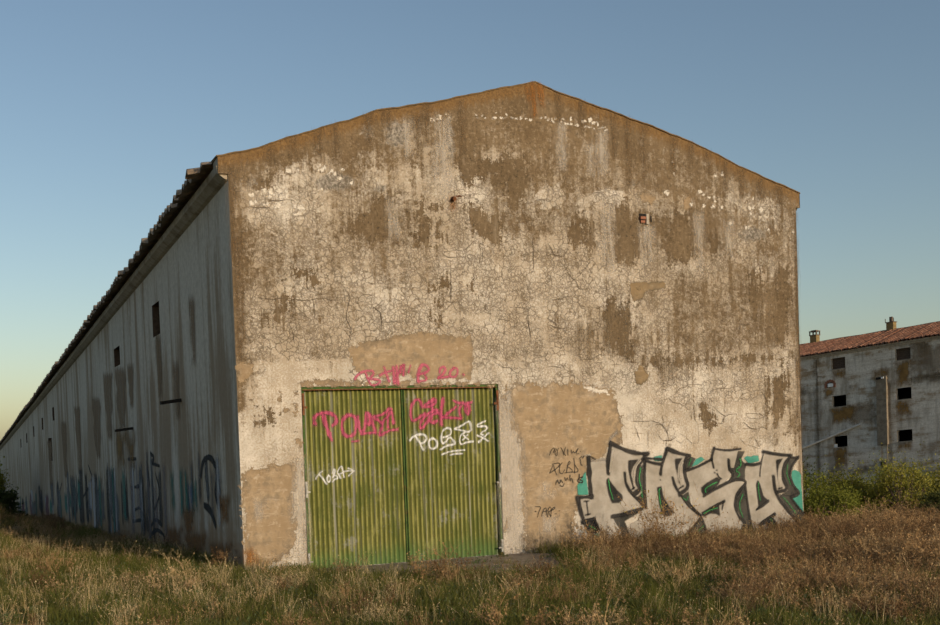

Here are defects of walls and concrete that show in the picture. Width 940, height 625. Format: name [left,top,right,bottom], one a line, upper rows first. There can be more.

spalling [235,362,254,383]
crack [255,287,400,343]
spalling [253,271,624,553]
crack [444,240,603,370]
crack [636,380,800,449]
spalling [237,431,305,569]